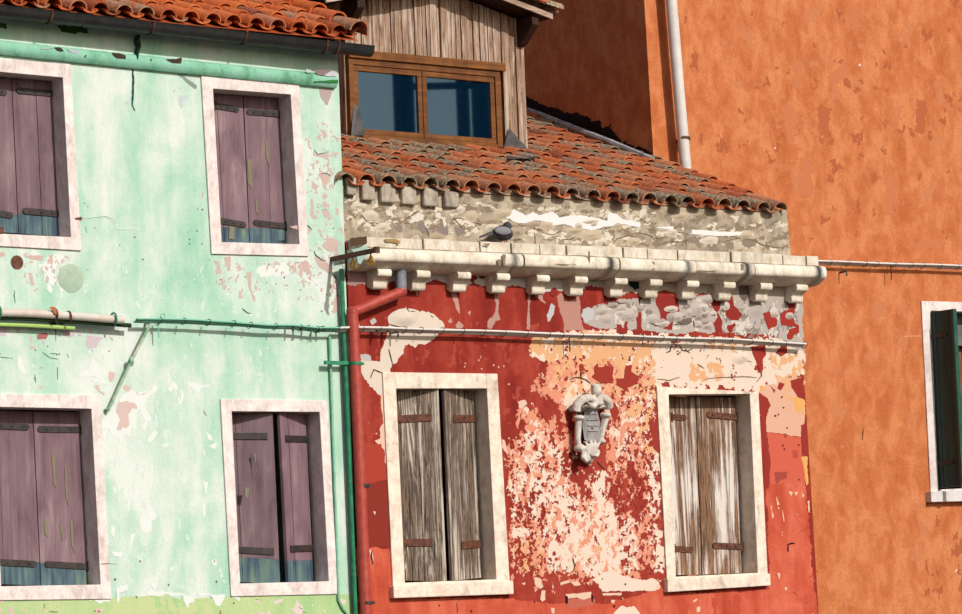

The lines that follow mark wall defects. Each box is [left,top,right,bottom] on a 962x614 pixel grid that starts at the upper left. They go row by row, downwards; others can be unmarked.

peeling [209,122,685,335]
flaking render [697,216,788,251]
peeling [23,253,69,293]
peeling [61,325,119,353]
peeling [95,371,210,448]
flaking render [360,307,444,463]
peeling [501,293,806,614]
peeling [254,598,313,614]